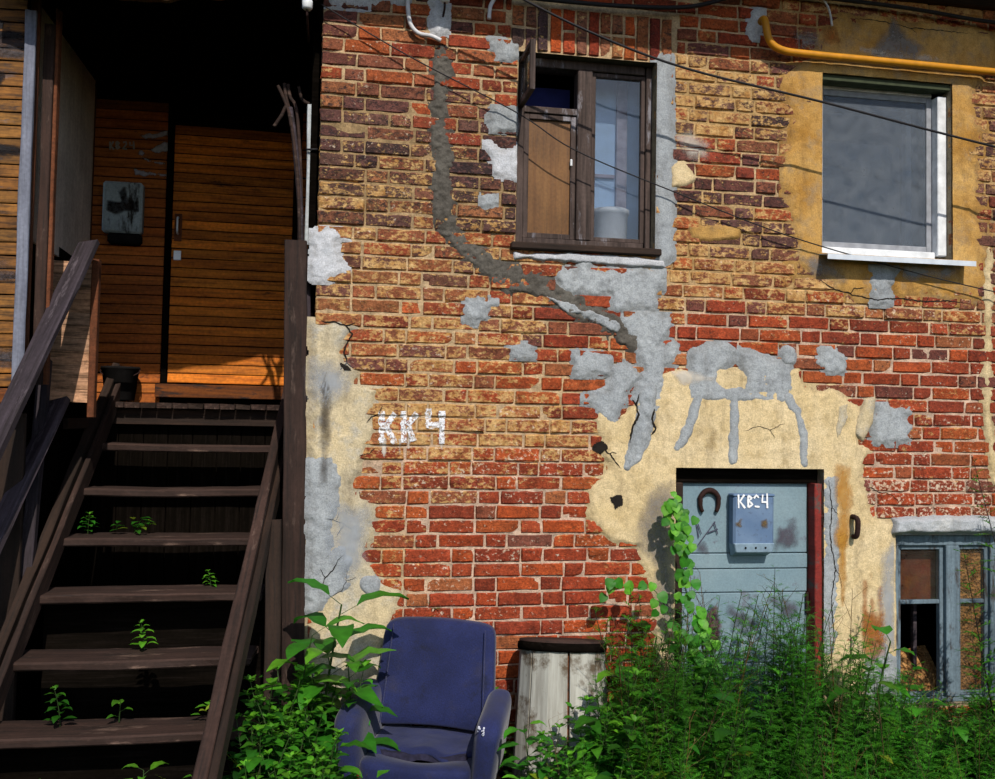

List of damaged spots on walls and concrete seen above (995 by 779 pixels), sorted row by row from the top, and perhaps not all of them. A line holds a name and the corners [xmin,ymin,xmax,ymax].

crack [427,45,637,353]
flaking render [672,161,697,189]
flaking render [687,223,742,242]
crack [605,395,657,467]
rust [835,471,850,580]